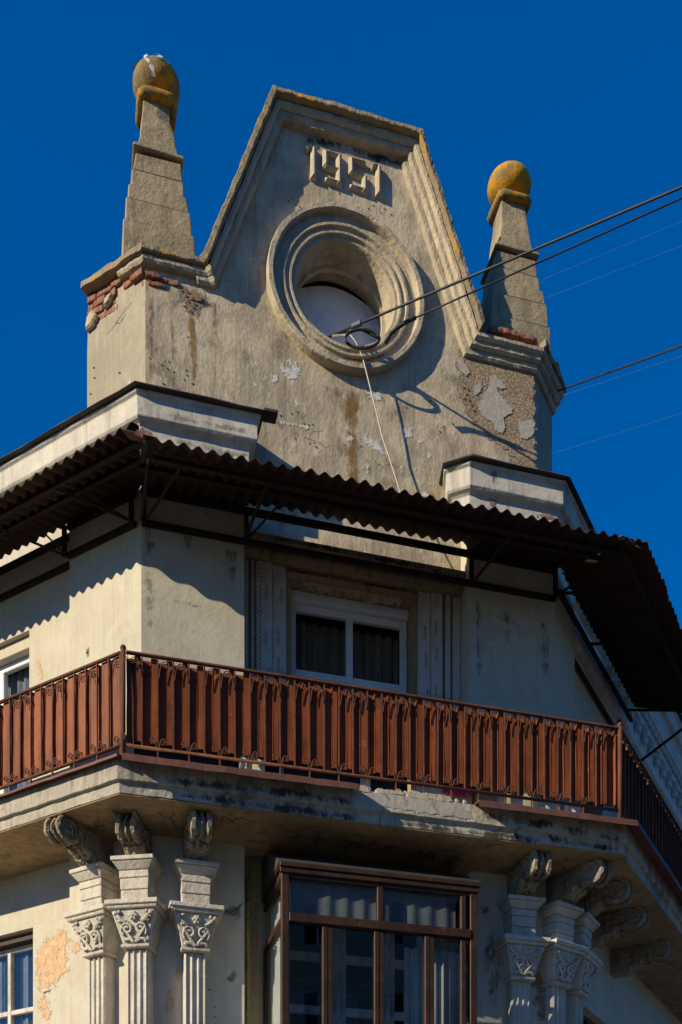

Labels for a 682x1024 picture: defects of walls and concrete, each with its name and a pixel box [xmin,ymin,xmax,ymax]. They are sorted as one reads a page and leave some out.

flaking render [85,267,212,333]
flaking render [486,323,539,346]
spalling [455,348,538,469]
damp [166,778,353,825]
spalling [354,785,473,819]
peeling [35,926,81,1020]